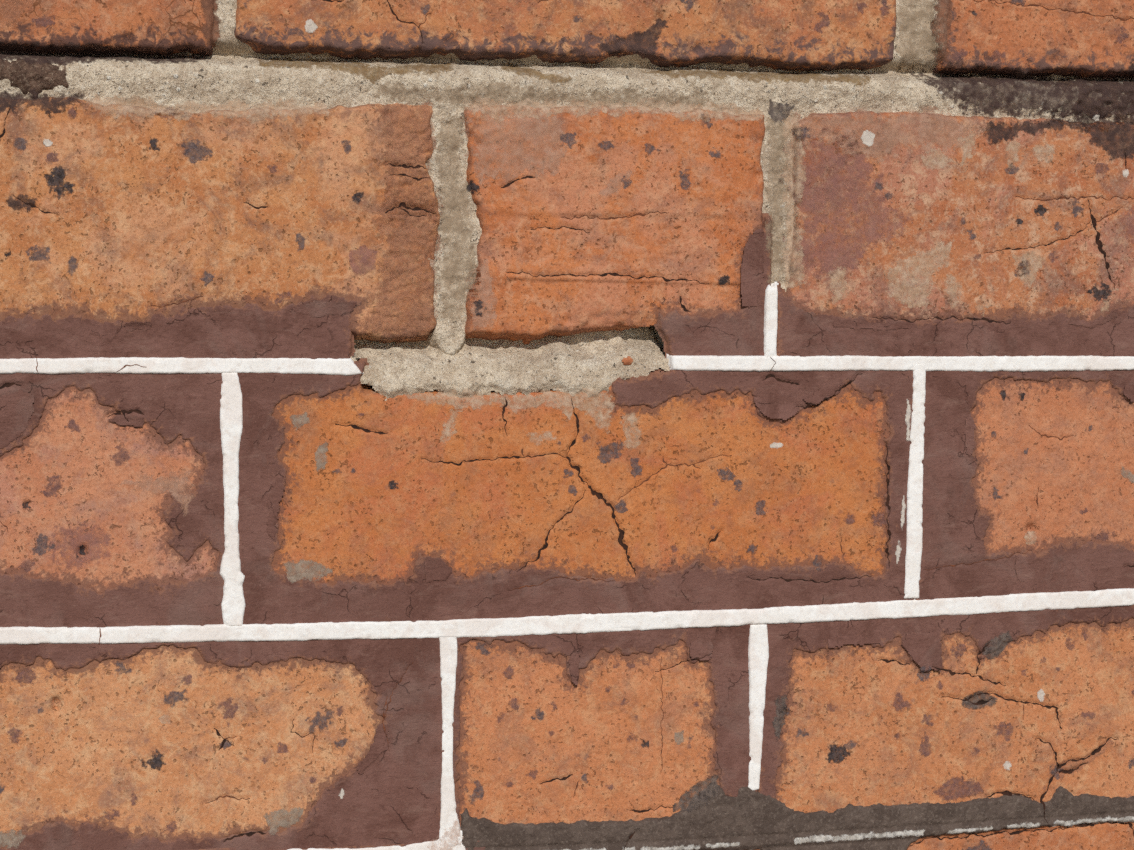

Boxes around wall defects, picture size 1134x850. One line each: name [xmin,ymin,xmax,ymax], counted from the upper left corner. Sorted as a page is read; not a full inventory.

crack [985,196,1134,289]
peeling [0,386,219,593]
crack [422,398,732,590]
peeling [266,377,890,585]
peeling [964,377,1134,554]
peeling [0,645,389,848]
peeling [455,635,720,826]
peeling [775,618,1134,813]
crack [881,643,1134,849]